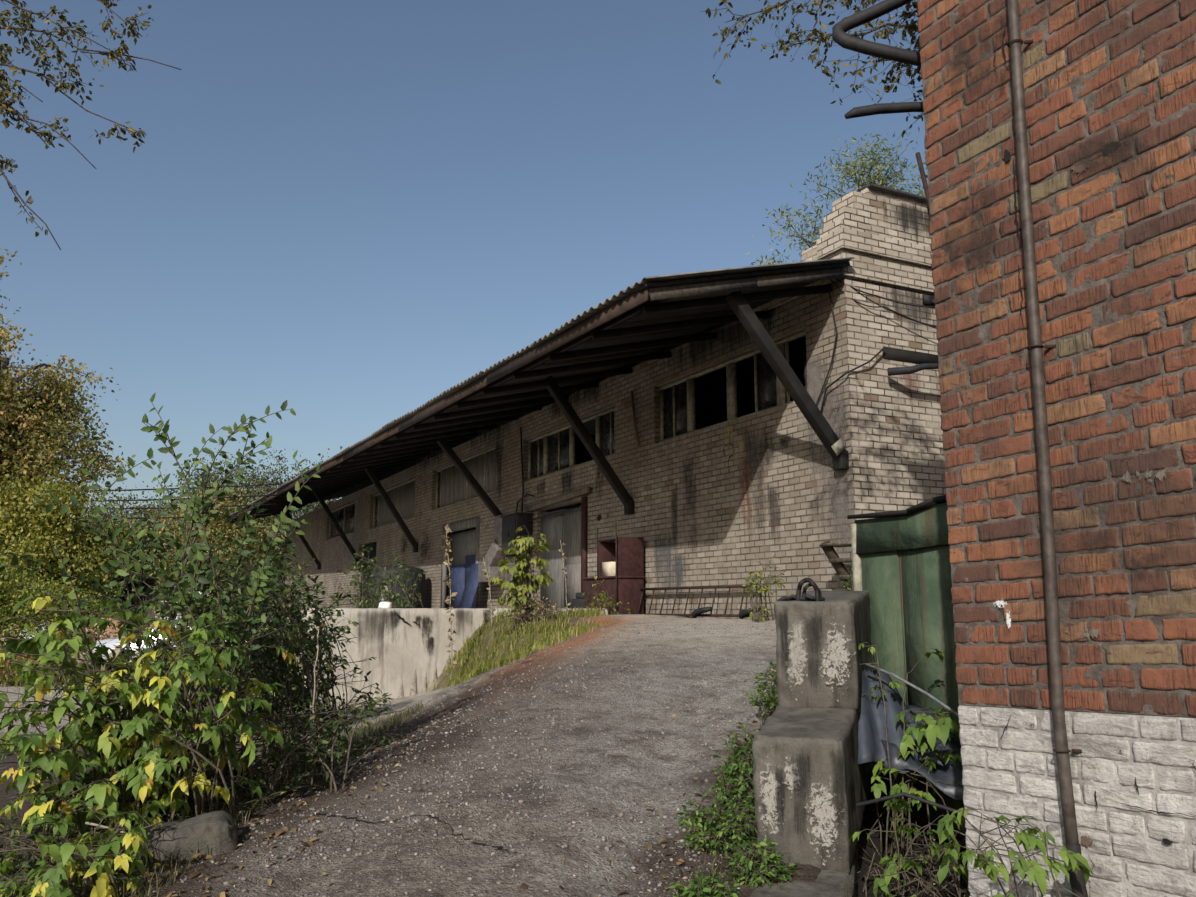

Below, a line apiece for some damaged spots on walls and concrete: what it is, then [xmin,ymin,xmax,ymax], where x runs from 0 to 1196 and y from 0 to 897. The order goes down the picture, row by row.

water stain [724,426,790,532]
water stain [655,459,695,585]
water stain [778,613,788,662]
water stain [809,616,821,683]
water stain [776,755,810,832]
crack [316,813,517,853]